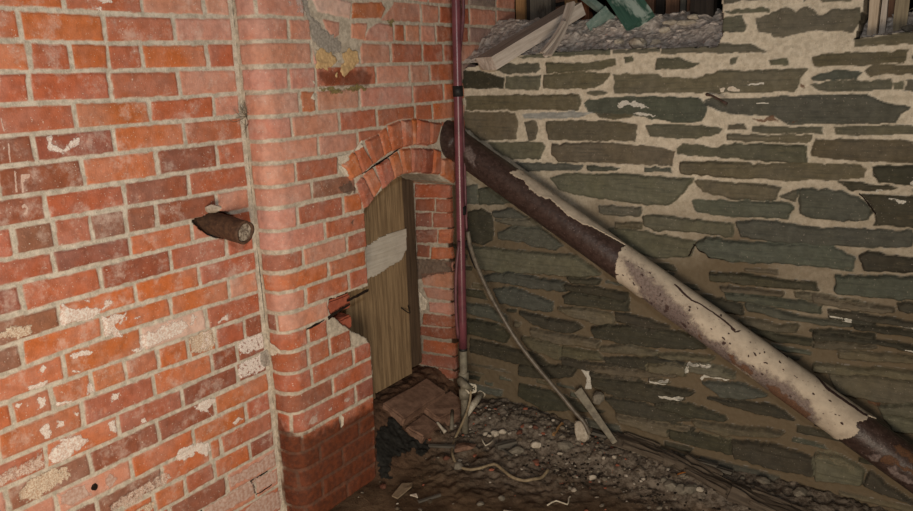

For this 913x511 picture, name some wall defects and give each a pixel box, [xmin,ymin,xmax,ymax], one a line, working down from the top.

peeling [311,48,366,100]
leakage [46,135,80,154]
leakage [0,325,32,339]
leakage [59,297,140,337]
leakage [132,314,197,353]
spalling [328,293,351,329]
leakage [238,334,265,379]
leakage [28,365,79,416]
leakage [0,421,89,486]
leakage [205,407,376,511]